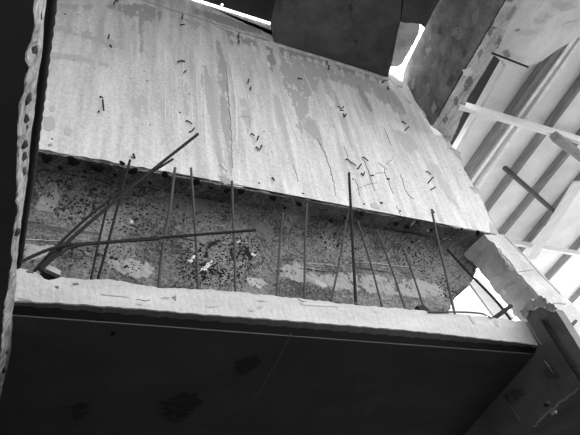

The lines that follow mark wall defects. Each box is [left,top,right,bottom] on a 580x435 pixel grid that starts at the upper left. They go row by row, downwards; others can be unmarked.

water stain [265,26,412,150]
crack [344,147,414,199]
peeling [275,172,513,320]
spalling [520,287,557,342]